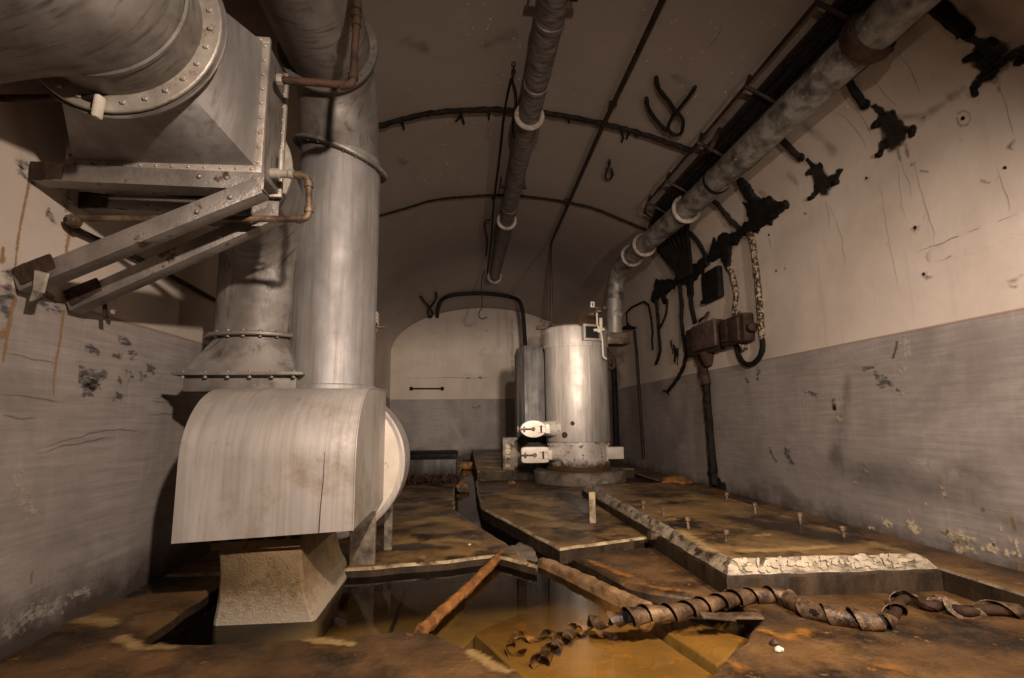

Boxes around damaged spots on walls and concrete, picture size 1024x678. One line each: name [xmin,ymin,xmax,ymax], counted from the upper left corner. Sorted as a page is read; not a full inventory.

peeling [79,366,106,396]
peeling [113,336,156,399]
peeling [864,339,910,395]
peeling [941,524,1017,560]
peeling [732,553,919,573]